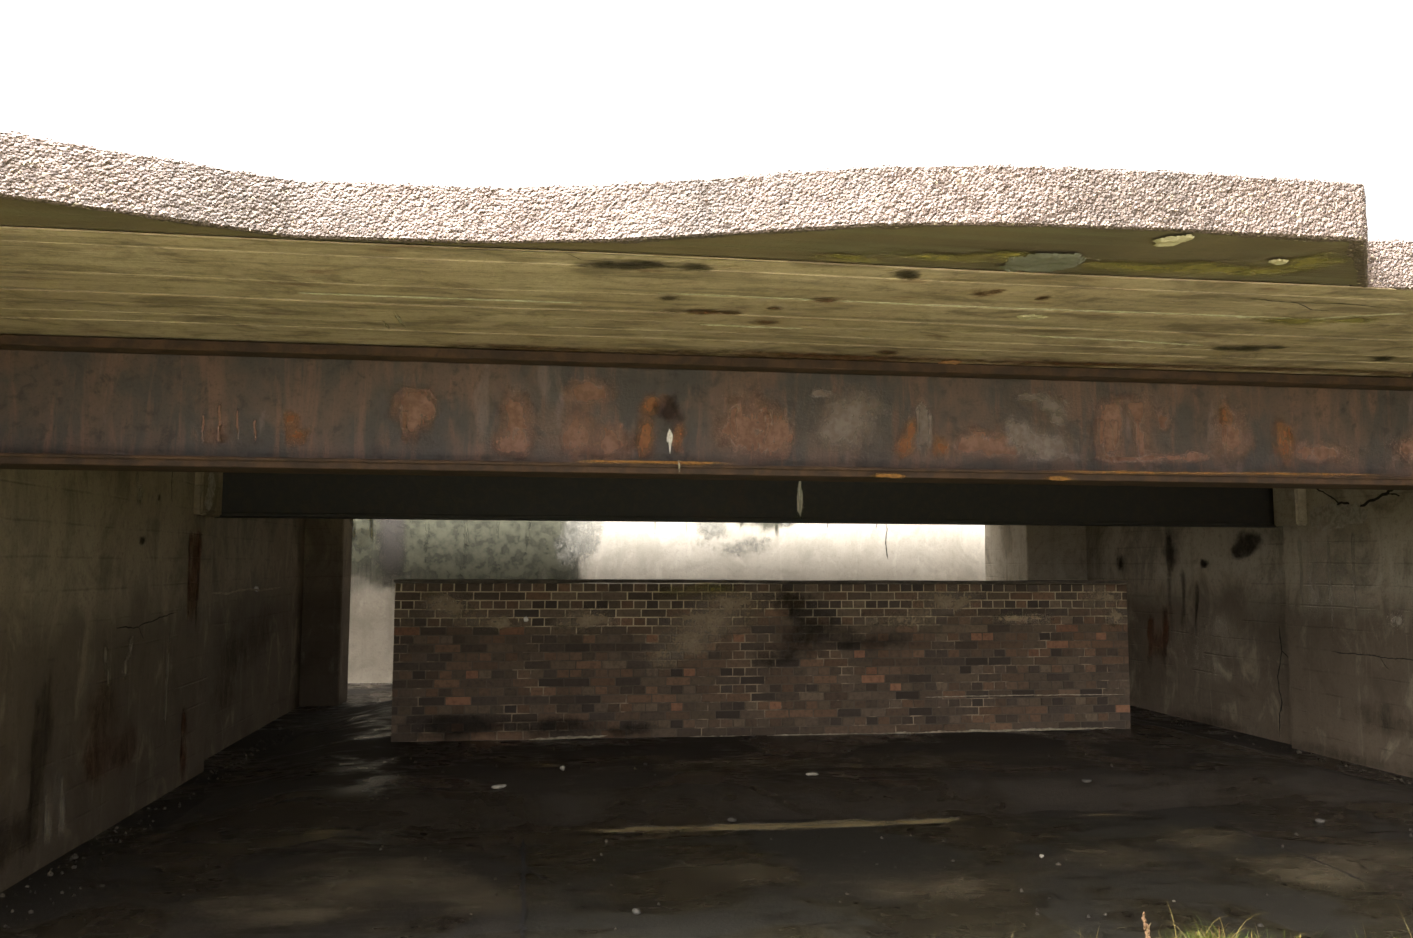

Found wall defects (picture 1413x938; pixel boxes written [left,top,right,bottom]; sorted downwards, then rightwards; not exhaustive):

rust [450,345,1385,374]
rust [493,392,533,459]
rust [577,396,723,465]
rust [872,402,932,478]
rust [954,393,1372,481]
crack [1317,489,1400,507]
damp [698,522,790,556]